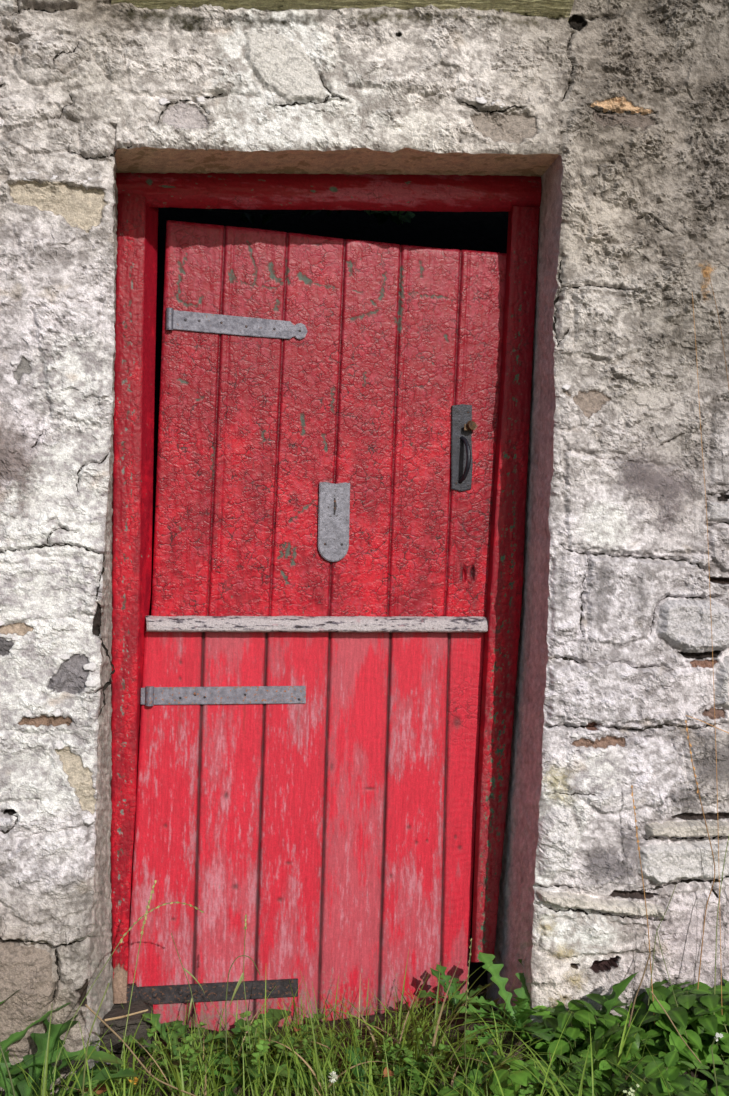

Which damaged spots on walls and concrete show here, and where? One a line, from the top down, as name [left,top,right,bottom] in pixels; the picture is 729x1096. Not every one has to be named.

crack [561,16,656,116]
spalling [590,96,657,131]
spalling [8,171,107,233]
crack [76,453,109,492]
spalling [0,621,34,656]
spalling [47,654,97,694]
spalling [18,709,72,727]
spalling [571,722,626,749]
spalling [54,741,97,824]